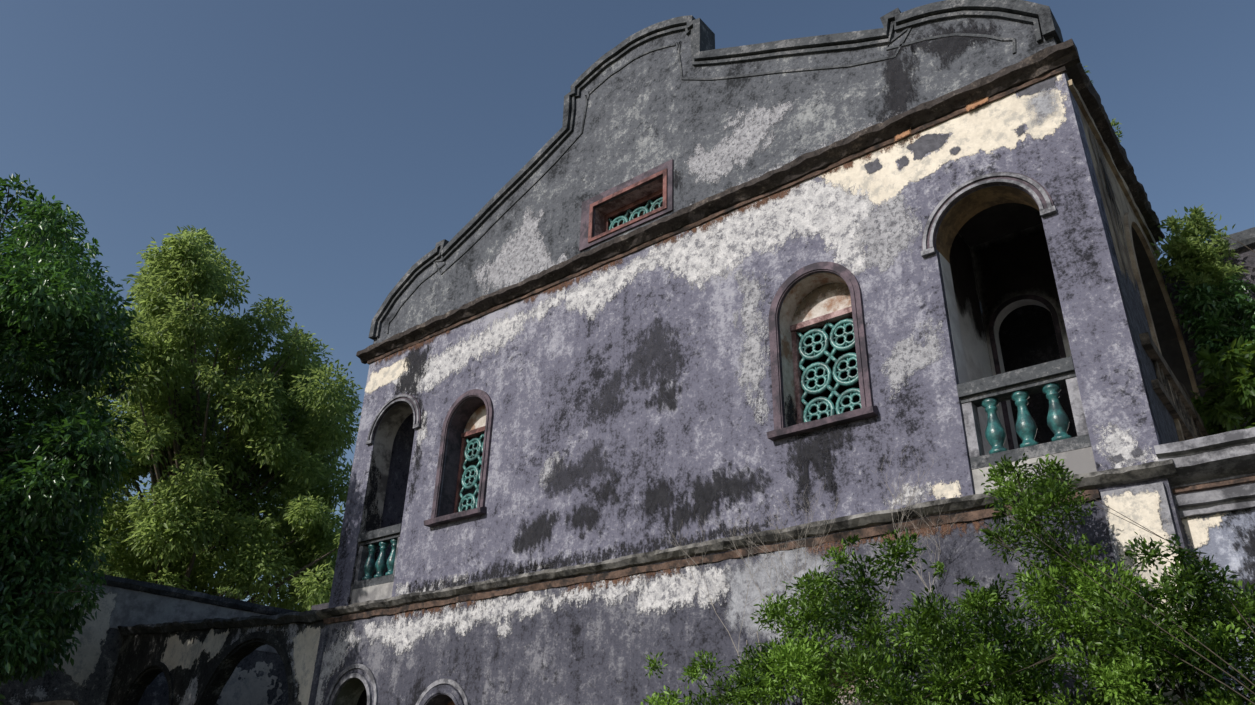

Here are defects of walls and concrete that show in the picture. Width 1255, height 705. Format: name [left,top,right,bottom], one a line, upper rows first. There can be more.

peeling [365,74,1067,426]
peeling [414,411,428,445]
water stain [408,317,779,593]
water stain [784,394,853,508]
peeling [1104,490,1225,619]
water stain [1220,508,1255,603]
peeling [161,563,730,705]
peeling [1145,663,1206,705]